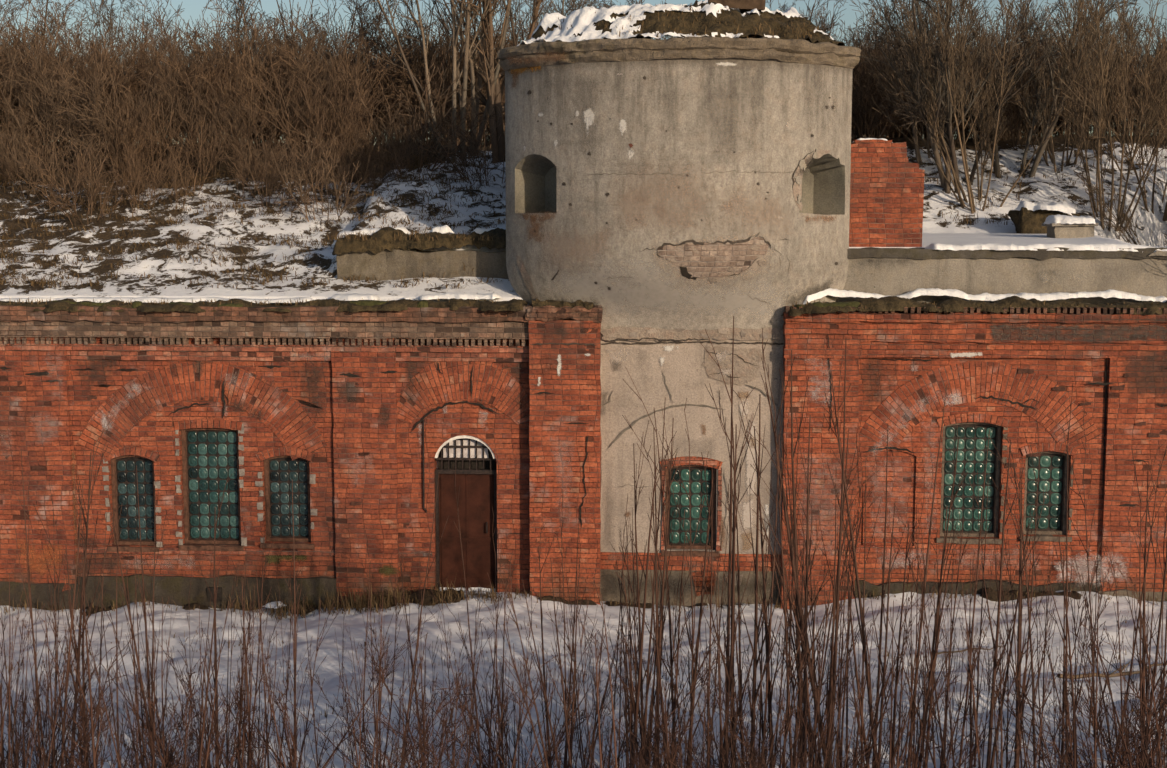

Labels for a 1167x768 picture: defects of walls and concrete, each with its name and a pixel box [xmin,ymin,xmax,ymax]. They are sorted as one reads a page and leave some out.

spalling [643,232,788,285]
crack [976,395,1036,409]
crack [531,341,784,527]
water stain [1057,559,1120,582]